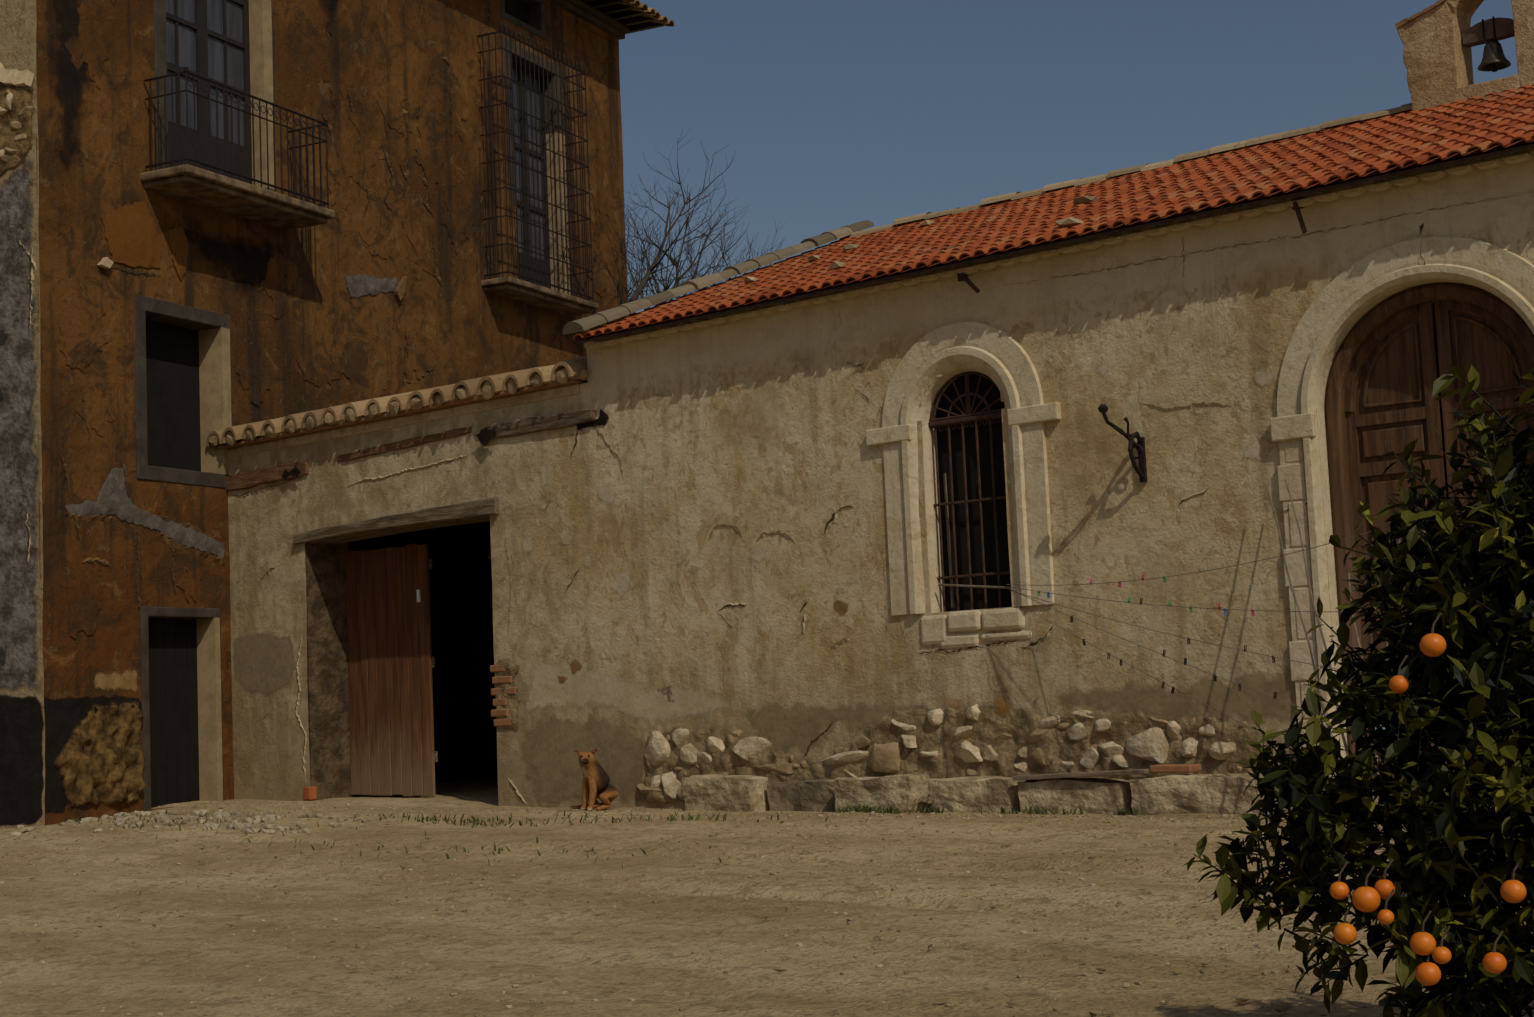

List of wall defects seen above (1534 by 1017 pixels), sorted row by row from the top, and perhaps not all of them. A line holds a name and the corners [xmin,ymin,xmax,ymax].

flaking render [65,465,225,566]
flaking render [490,659,521,730]